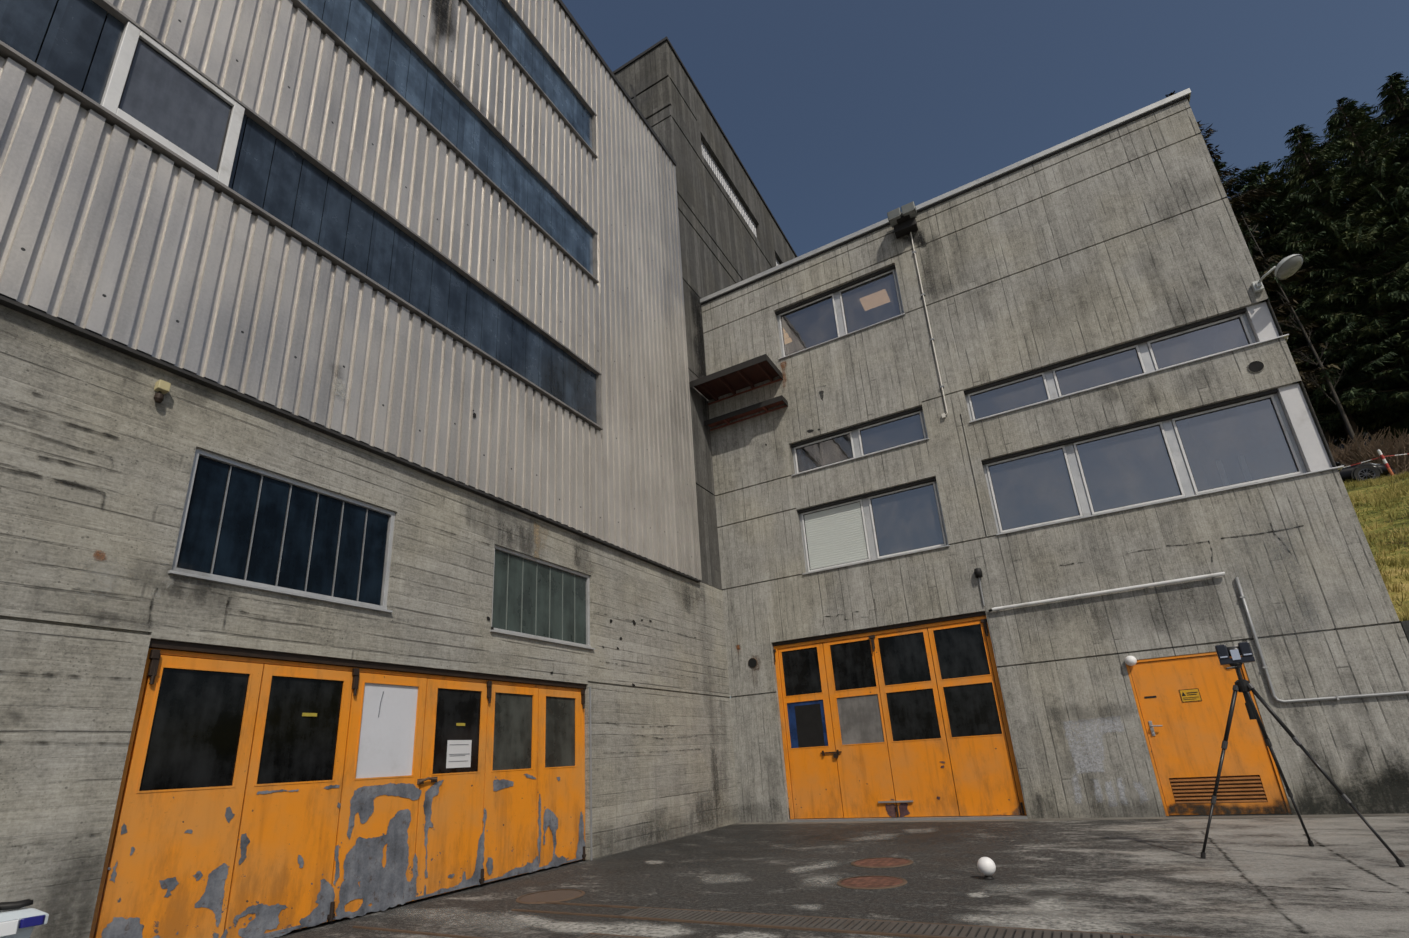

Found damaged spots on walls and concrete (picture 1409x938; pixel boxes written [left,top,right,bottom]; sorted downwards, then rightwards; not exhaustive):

peeling [108,824,135,882]
peeling [159,774,585,938]
peeling [101,917,160,938]